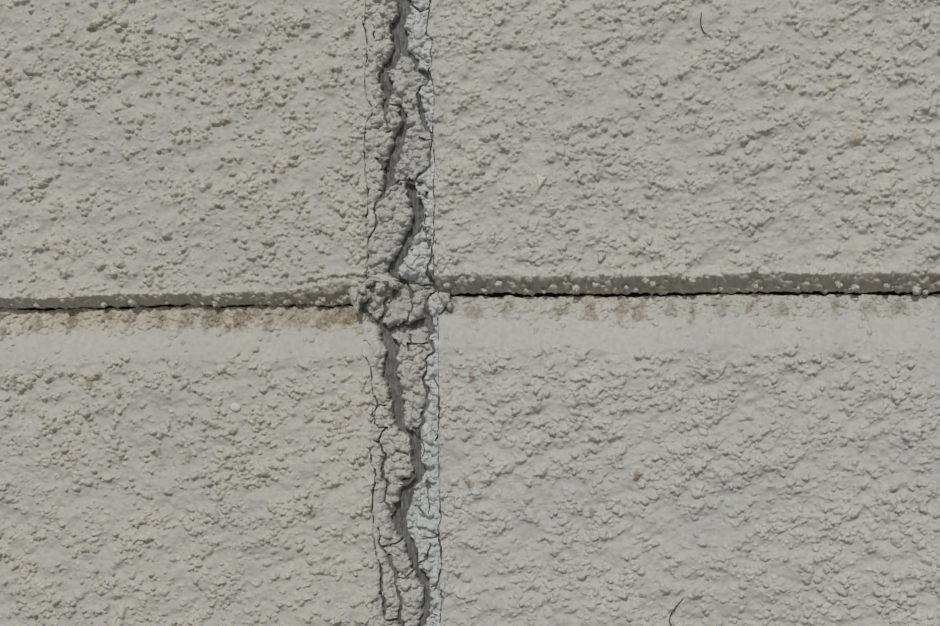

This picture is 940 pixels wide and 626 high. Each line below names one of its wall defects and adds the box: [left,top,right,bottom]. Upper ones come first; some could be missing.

crack [18,303,296,311]
crack [320,0,940,626]